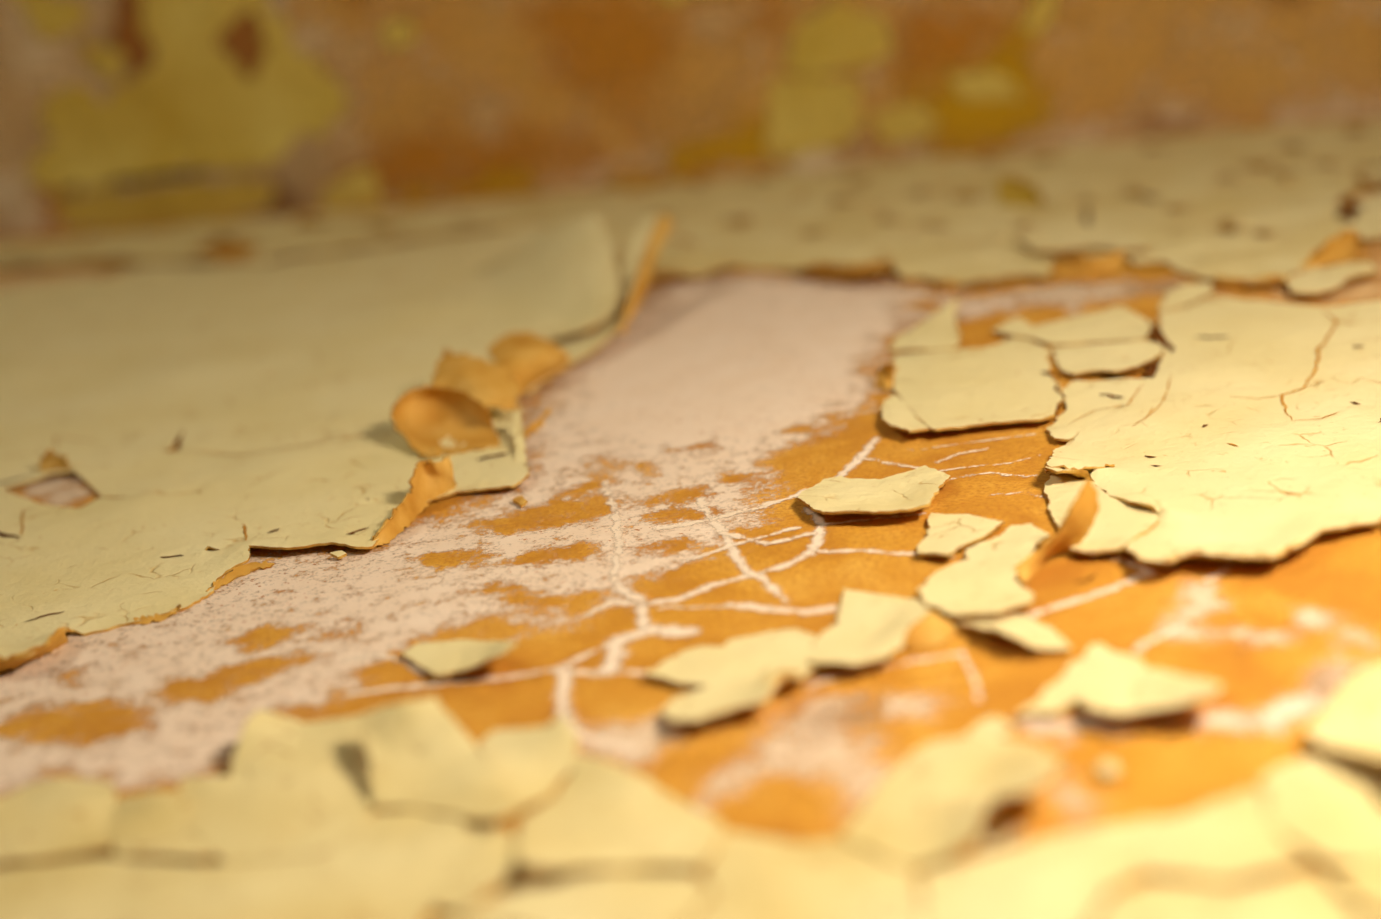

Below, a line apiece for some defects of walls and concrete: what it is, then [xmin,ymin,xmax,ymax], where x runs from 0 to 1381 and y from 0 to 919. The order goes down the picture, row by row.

peeling [0,0,1381,724]
crack [344,319,1233,756]
crack [1234,309,1381,423]
peeling [0,643,1381,919]